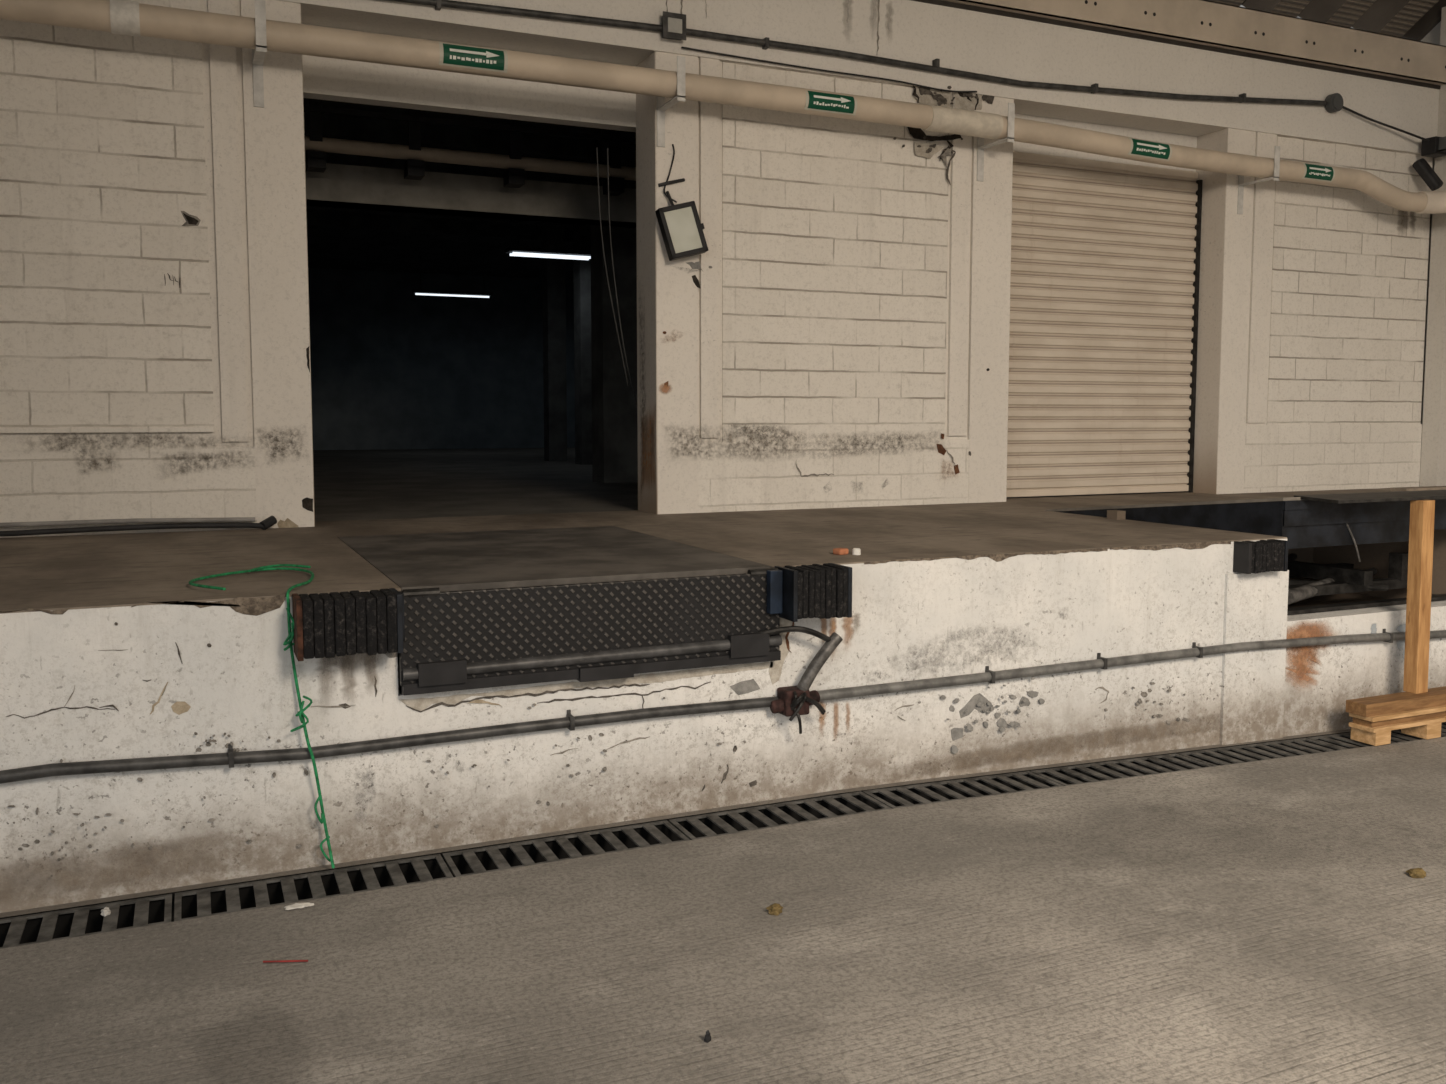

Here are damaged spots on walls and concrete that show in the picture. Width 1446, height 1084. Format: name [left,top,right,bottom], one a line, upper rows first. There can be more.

leakage [47,434,226,472]
leakage [722,427,799,455]
spalling [131,594,285,616]
spalling [400,617,794,713]
corrosion [1286,625,1329,682]
peeling [940,676,1045,754]
spalling [18,813,153,877]